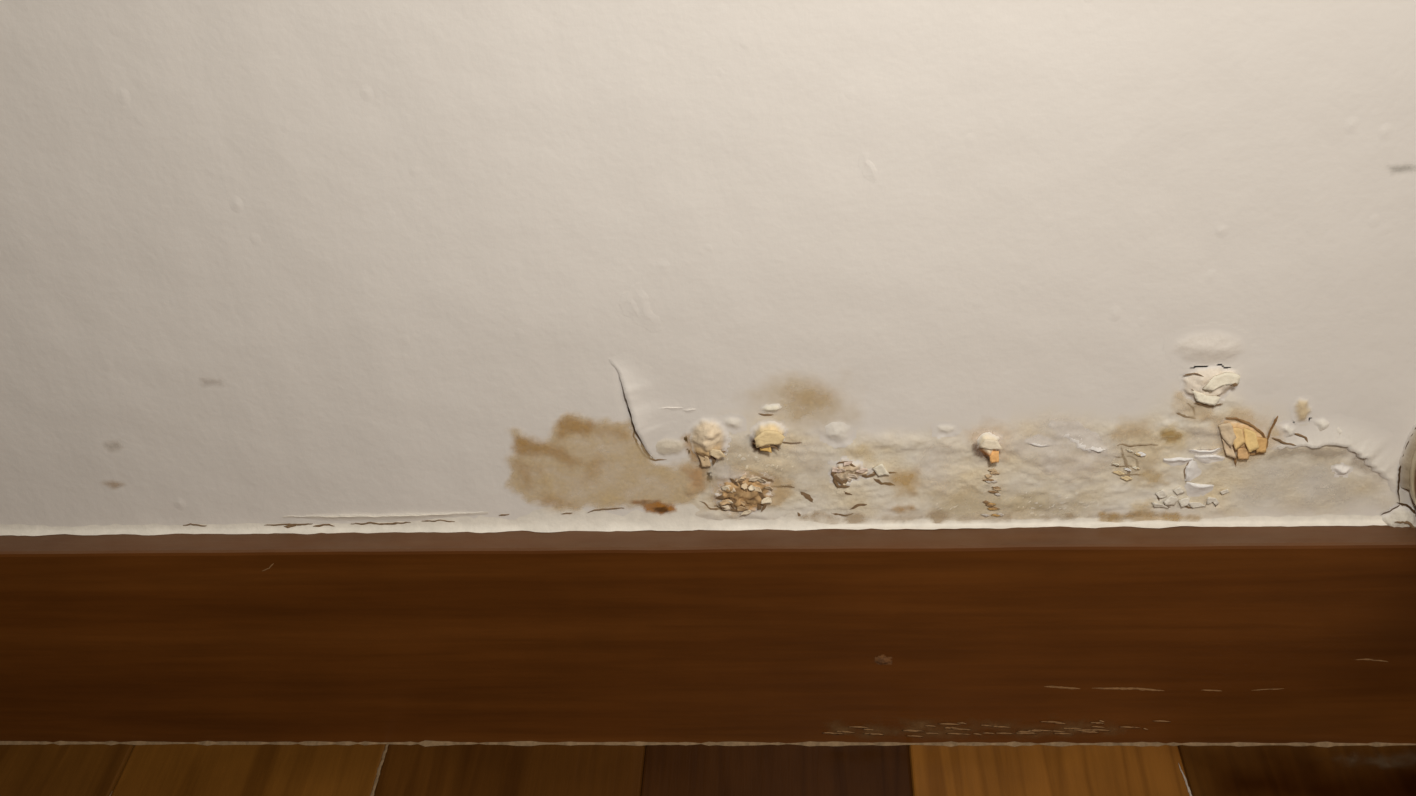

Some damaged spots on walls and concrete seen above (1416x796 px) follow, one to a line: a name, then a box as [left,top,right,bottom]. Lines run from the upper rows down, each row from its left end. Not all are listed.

crack [608,353,696,461]
spalling [700,470,813,516]
spalling [828,456,897,517]
leakage [512,368,1415,521]
peeling [1152,413,1406,509]